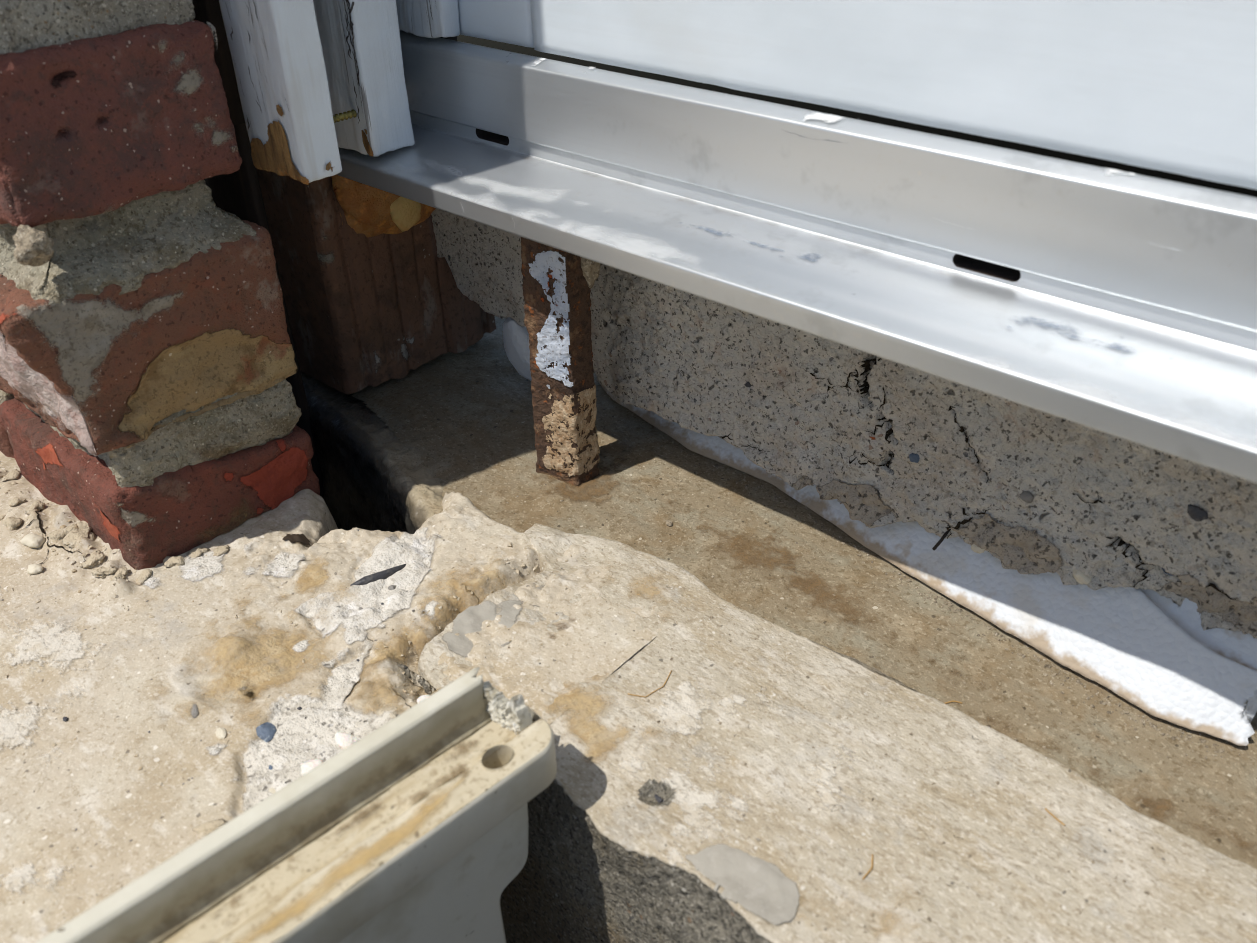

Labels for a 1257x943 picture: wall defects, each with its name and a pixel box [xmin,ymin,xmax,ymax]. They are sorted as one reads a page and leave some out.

spalling [234,527,441,811]
spalling [638,779,676,806]